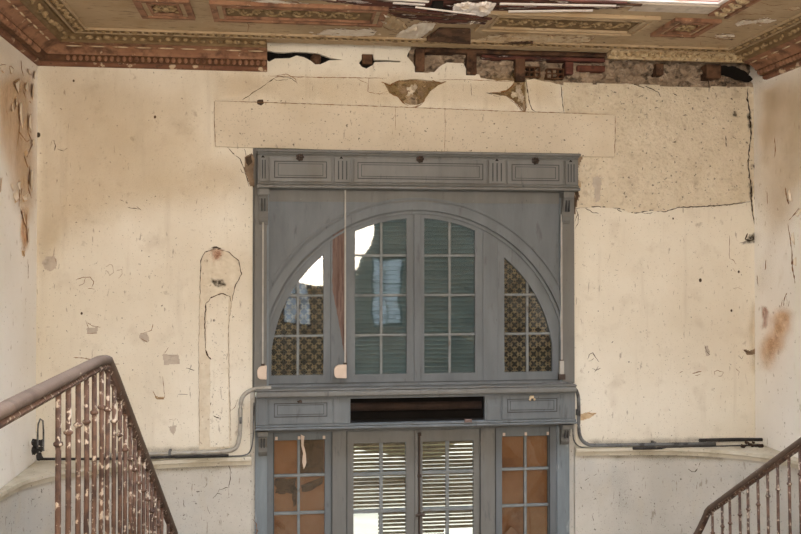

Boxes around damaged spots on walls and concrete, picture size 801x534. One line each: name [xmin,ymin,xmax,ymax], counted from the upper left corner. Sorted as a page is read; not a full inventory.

spalling [267,51,333,64]
flaking render [309,0,633,39]
peeling [476,33,594,44]
peeling [715,16,777,40]
flaking render [382,80,446,107]
flaking render [490,84,527,111]
crack [214,74,616,186]
peeling [0,62,36,256]
crack [575,89,768,289]
crack [183,246,242,395]
crack [199,378,238,445]